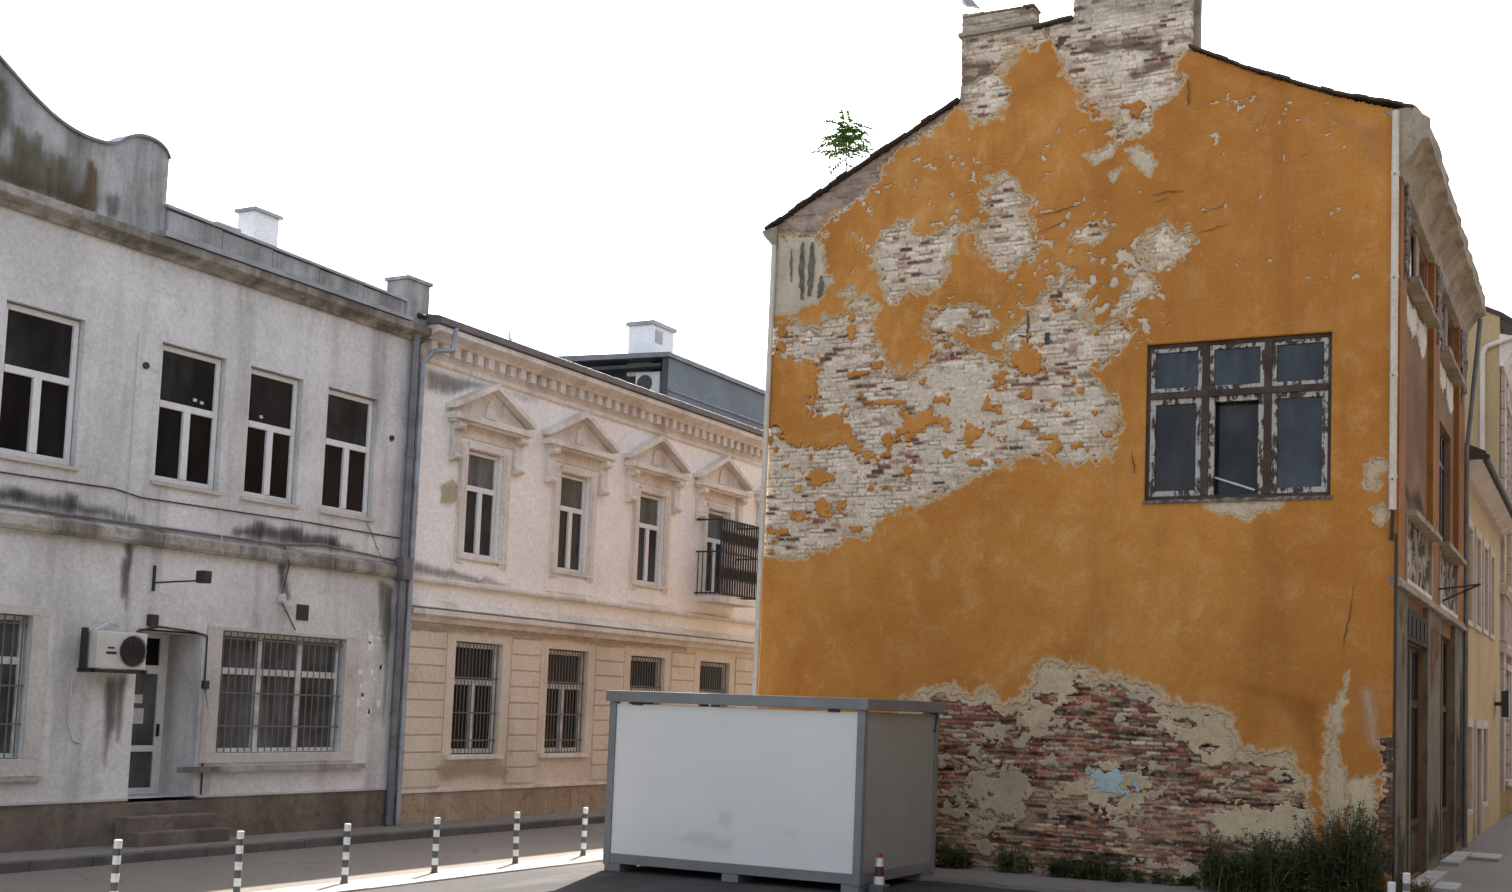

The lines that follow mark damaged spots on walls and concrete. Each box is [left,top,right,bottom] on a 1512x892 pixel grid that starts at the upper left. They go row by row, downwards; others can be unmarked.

water stain [0,79,75,196]
flaking render [764,0,1228,561]
spalling [1403,181,1468,415]
water stain [107,681,123,730]
flaking render [901,659,1393,892]
crack [1342,584,1355,649]